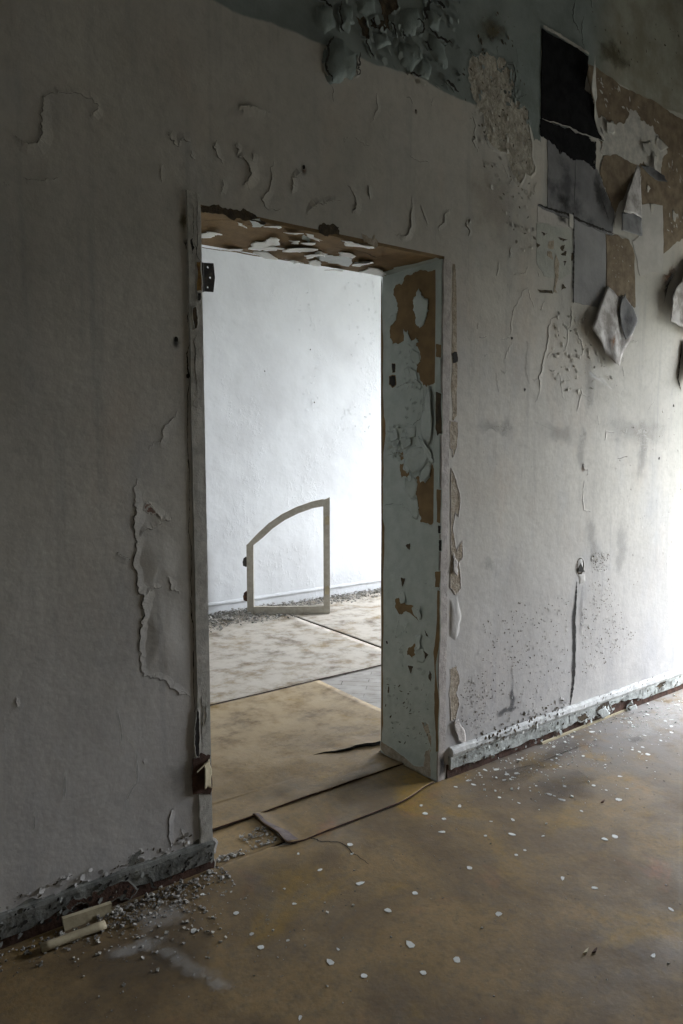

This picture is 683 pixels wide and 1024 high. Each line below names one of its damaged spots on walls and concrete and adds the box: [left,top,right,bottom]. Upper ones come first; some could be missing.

peeling [190,232,222,291]
spalling [462,32,573,295]
peeling [201,205,681,768]
peeling [0,829,218,948]